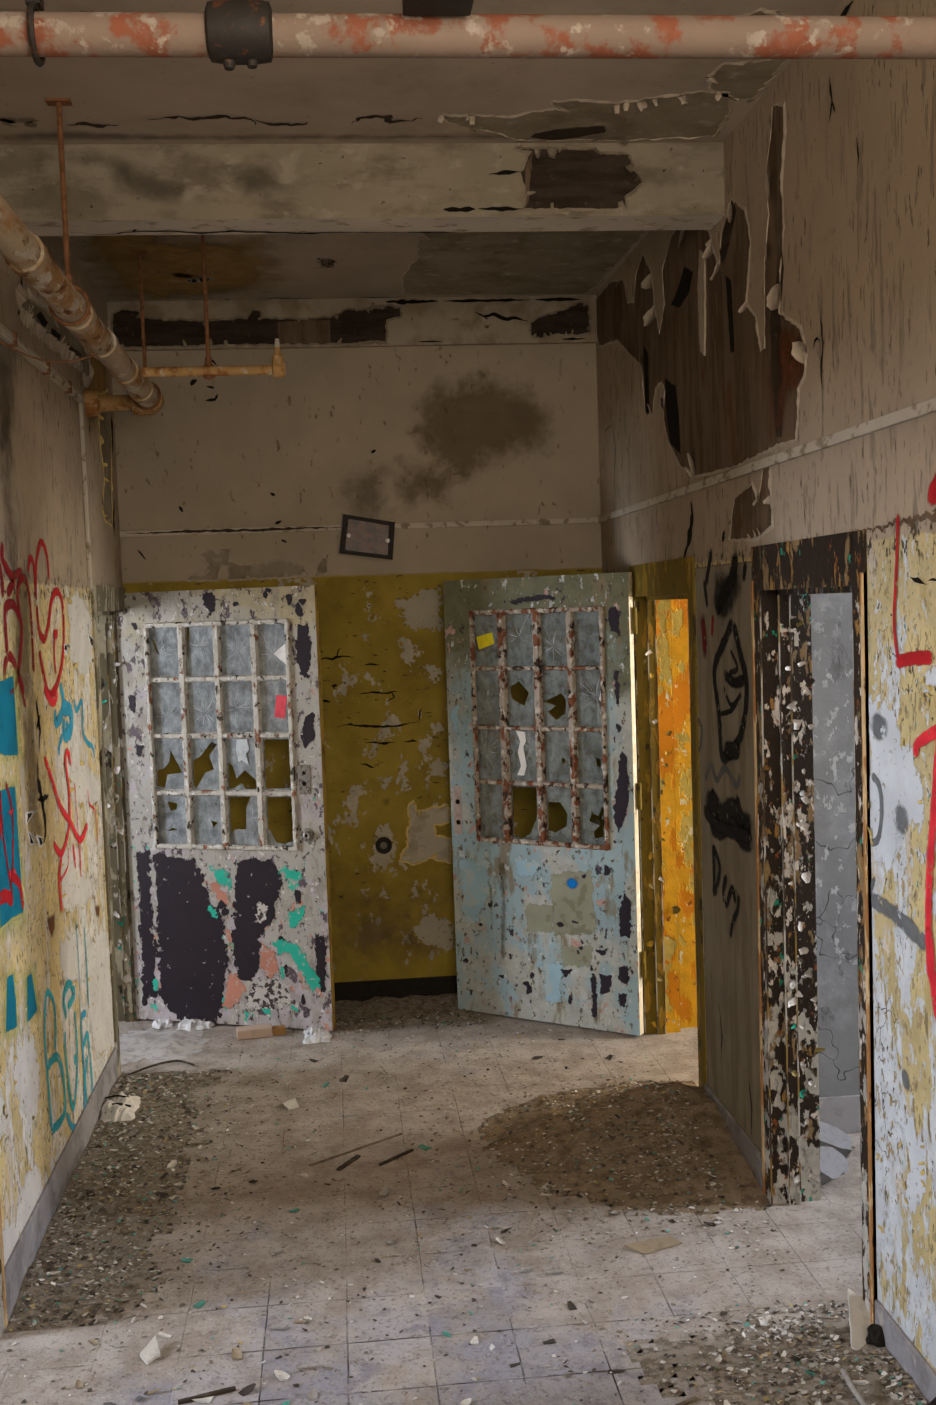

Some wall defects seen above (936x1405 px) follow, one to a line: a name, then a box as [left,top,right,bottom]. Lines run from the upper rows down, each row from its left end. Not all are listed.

water stain [88,235,271,299]
peeling [110,59,808,542]
water stain [425,387,542,475]
peeling [64,590,112,677]
peeling [361,586,444,651]
peeling [920,666,936,721]
peeling [69,724,127,847]
peeling [866,694,925,872]
peeling [371,758,456,953]
peeling [25,810,131,1062]
peeling [0,1029,40,1146]
peeling [875,1102,927,1272]